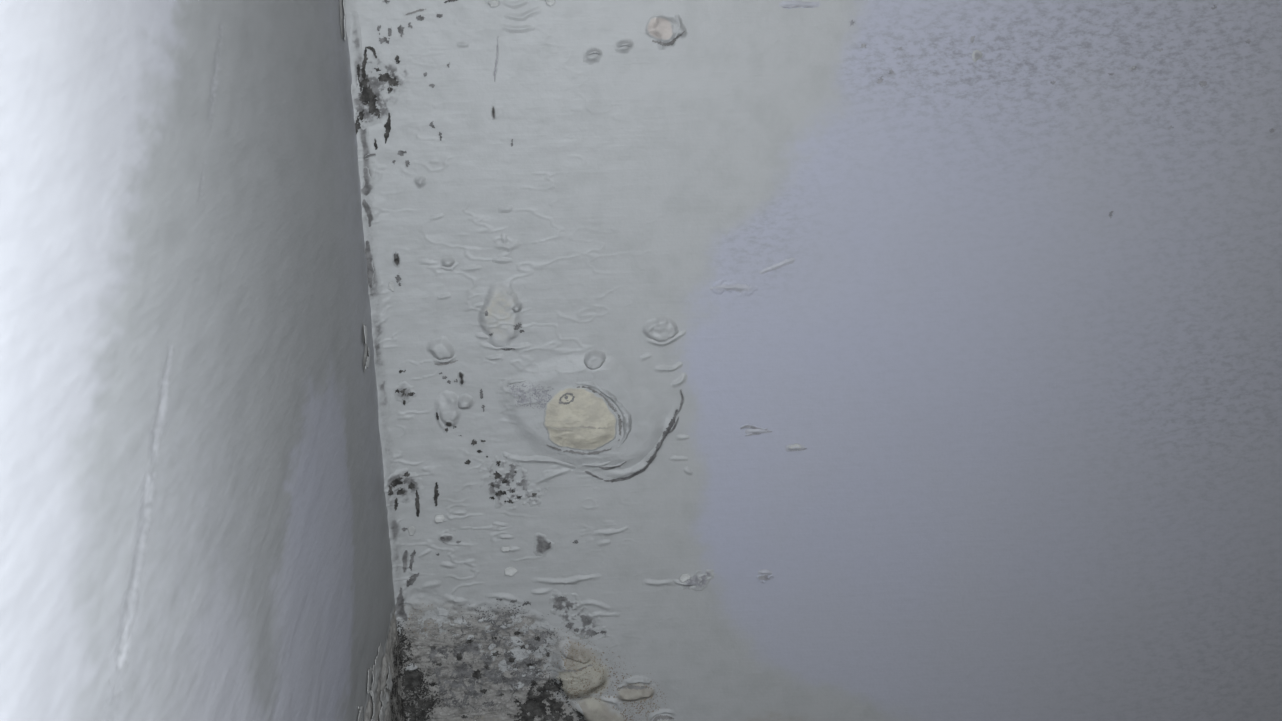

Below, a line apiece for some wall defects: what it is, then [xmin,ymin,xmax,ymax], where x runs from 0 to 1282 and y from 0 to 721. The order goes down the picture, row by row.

water stain [26,0,944,721]